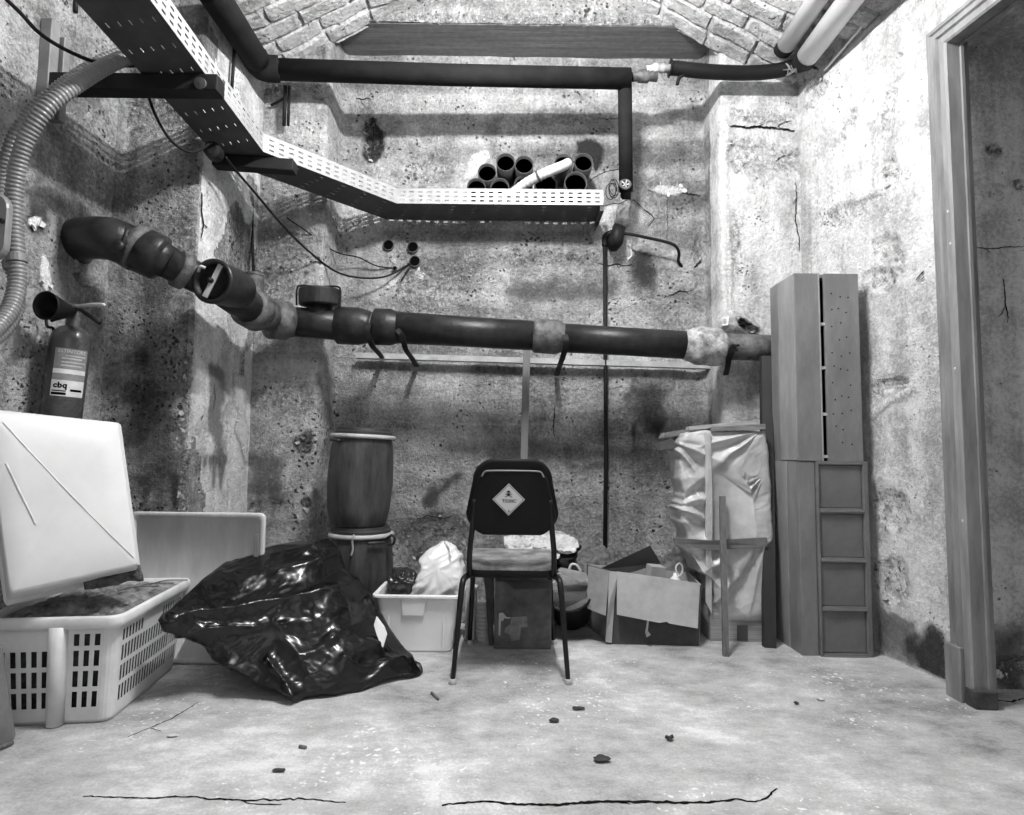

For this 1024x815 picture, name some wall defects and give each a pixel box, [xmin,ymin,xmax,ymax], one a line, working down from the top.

crack [729,120,794,132]
peeling [652,182,687,197]
crack [792,182,800,251]
water stain [906,624,945,679]
crack [83,795,346,805]
crack [442,788,777,806]